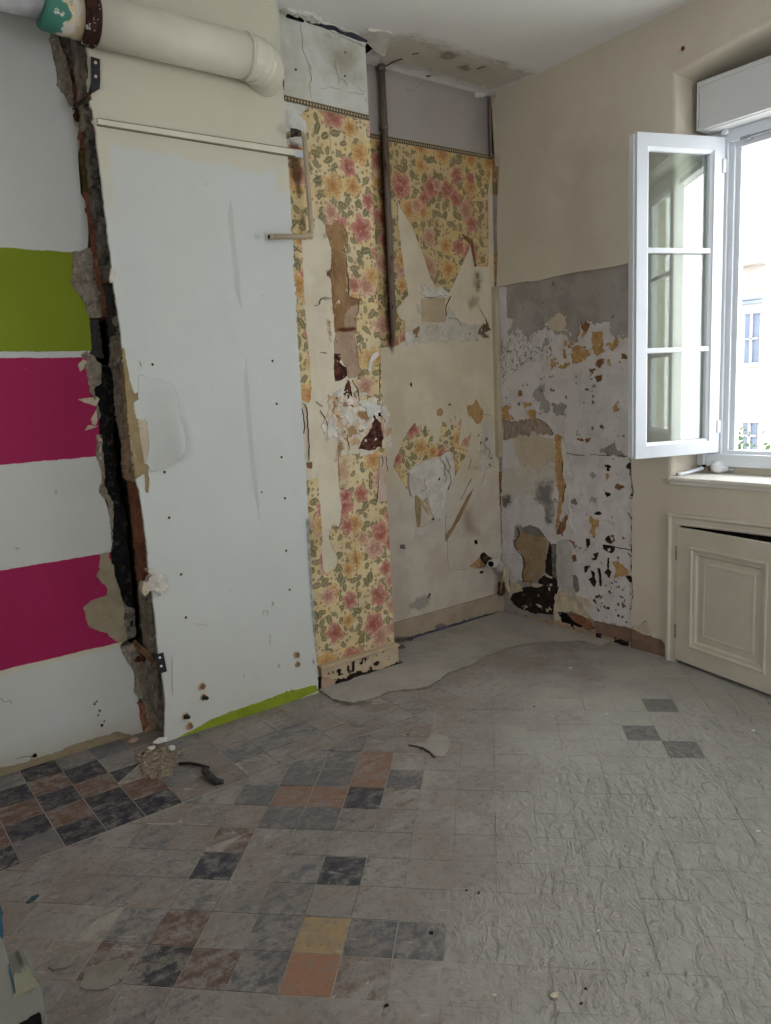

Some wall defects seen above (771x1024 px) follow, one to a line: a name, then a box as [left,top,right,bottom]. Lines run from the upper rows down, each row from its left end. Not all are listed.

crack [300,25,366,100]
flaking render [284,101,307,148]
flaking render [325,221,389,457]
peeling [138,419,149,463]
peeling [407,283,652,647]
peeling [83,552,127,642]